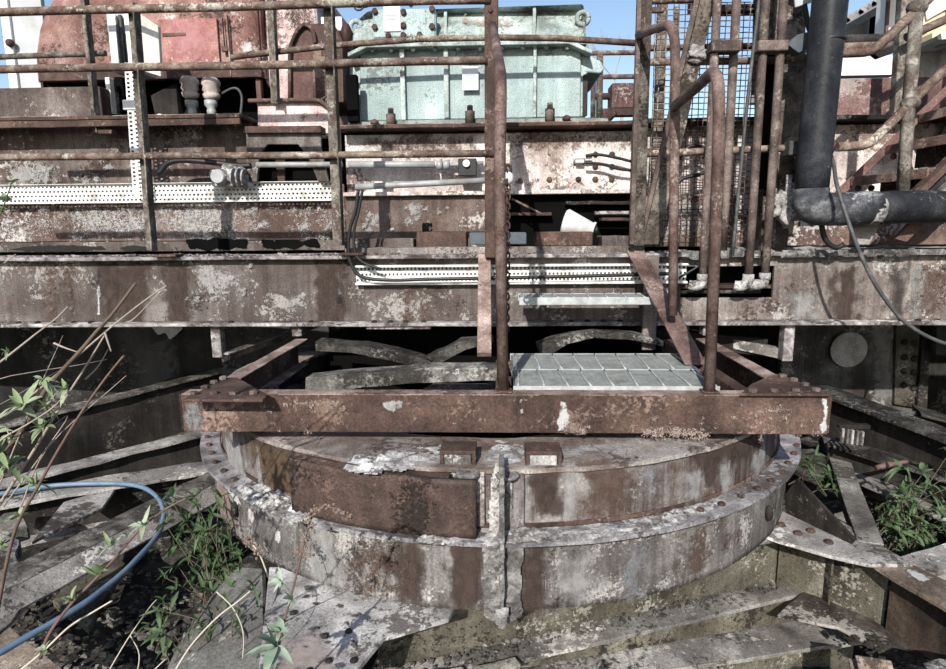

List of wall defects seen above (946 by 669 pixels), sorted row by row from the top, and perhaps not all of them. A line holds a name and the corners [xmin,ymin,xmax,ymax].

corrosion [277,9,316,30]
corrosion [509,129,632,187]
corrosion [13,245,192,322]
corrosion [314,261,345,330]
corrosion [403,286,434,321]
corrosion [829,266,864,328]
corrosion [906,260,946,317]
corrosion [251,438,292,494]
peeling [228,491,254,523]